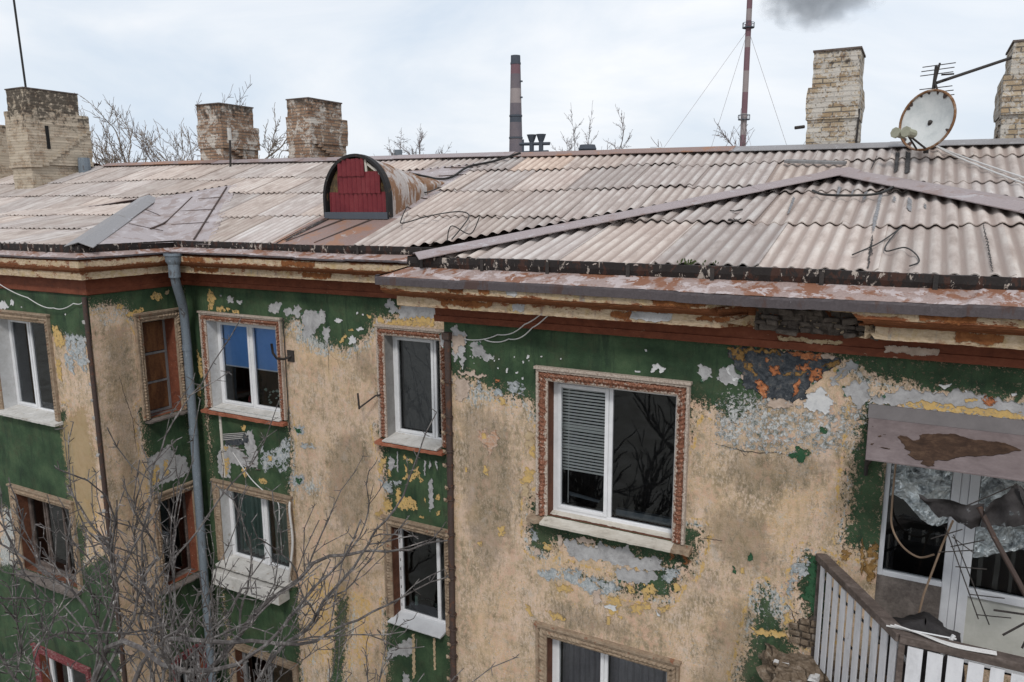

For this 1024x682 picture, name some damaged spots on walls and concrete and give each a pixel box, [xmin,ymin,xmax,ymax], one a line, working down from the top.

rust [651,300,730,323]
peeling [52,325,88,381]
peeling [268,299,542,405]
flaking render [697,296,1024,467]
peeling [147,444,189,486]
peeling [217,425,316,487]
peeling [375,451,440,519]
peeling [525,529,681,625]